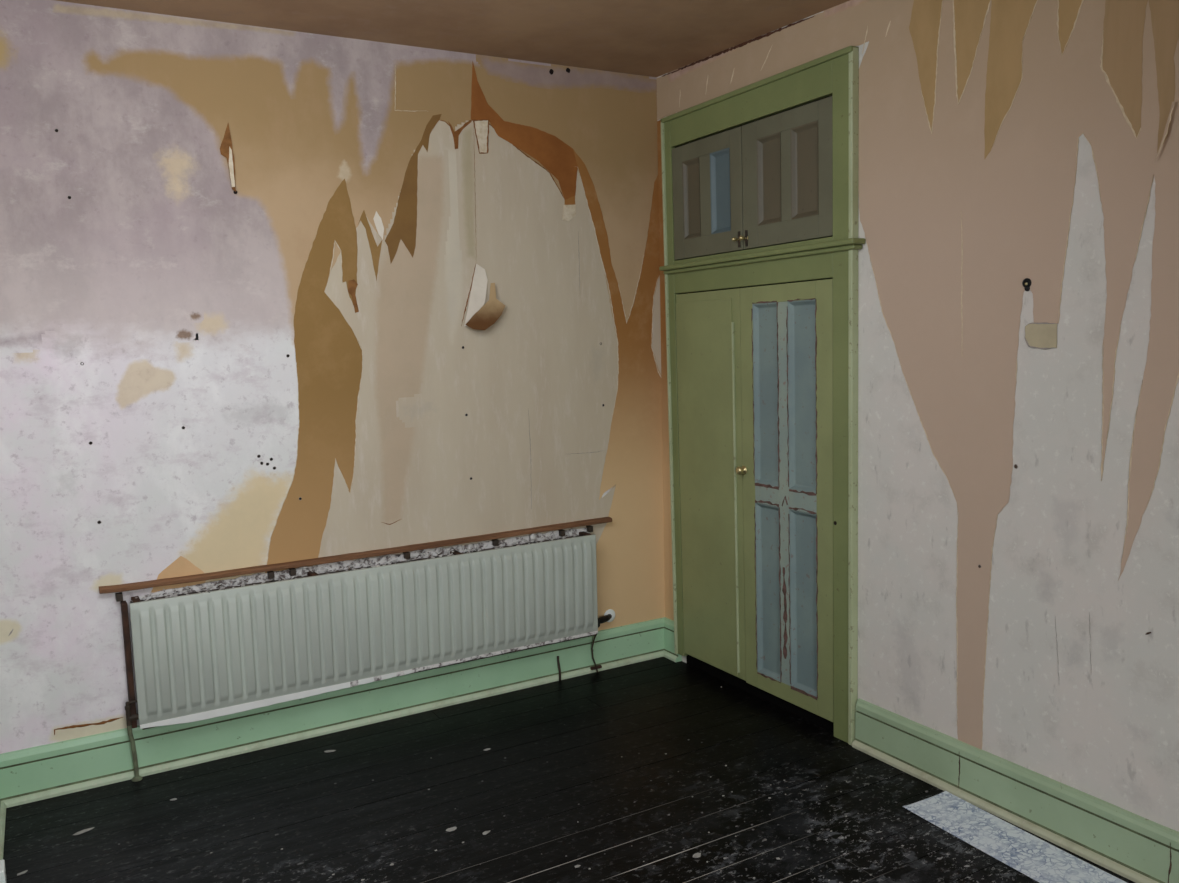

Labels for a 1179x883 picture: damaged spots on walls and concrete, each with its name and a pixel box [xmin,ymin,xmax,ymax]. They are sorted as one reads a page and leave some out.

peeling [909,0,1038,159]
peeling [1057,0,1084,55]
peeling [1100,0,1179,162]
peeling [139,48,737,631]